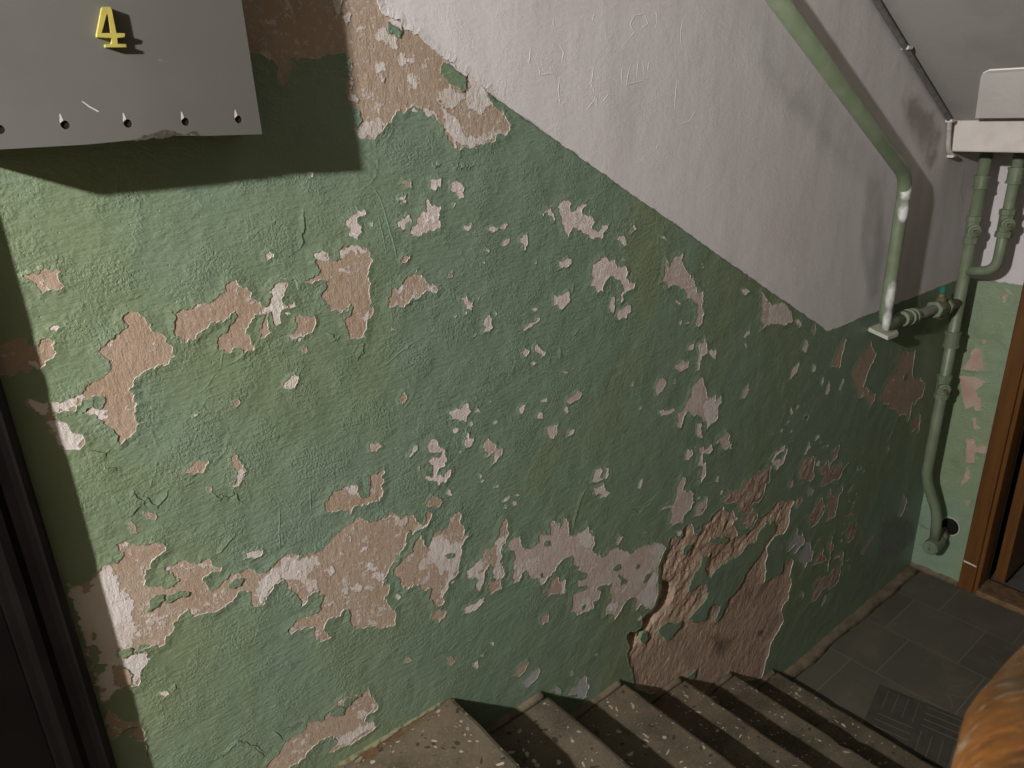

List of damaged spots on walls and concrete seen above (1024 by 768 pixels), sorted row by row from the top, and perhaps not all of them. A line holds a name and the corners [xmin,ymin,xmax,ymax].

peeling [241,0,516,159]
peeling [0,165,467,459]
peeling [61,234,873,745]
peeling [482,221,537,266]
peeling [538,193,639,322]
peeling [740,286,927,436]
peeling [954,339,989,506]
peeling [260,681,383,768]